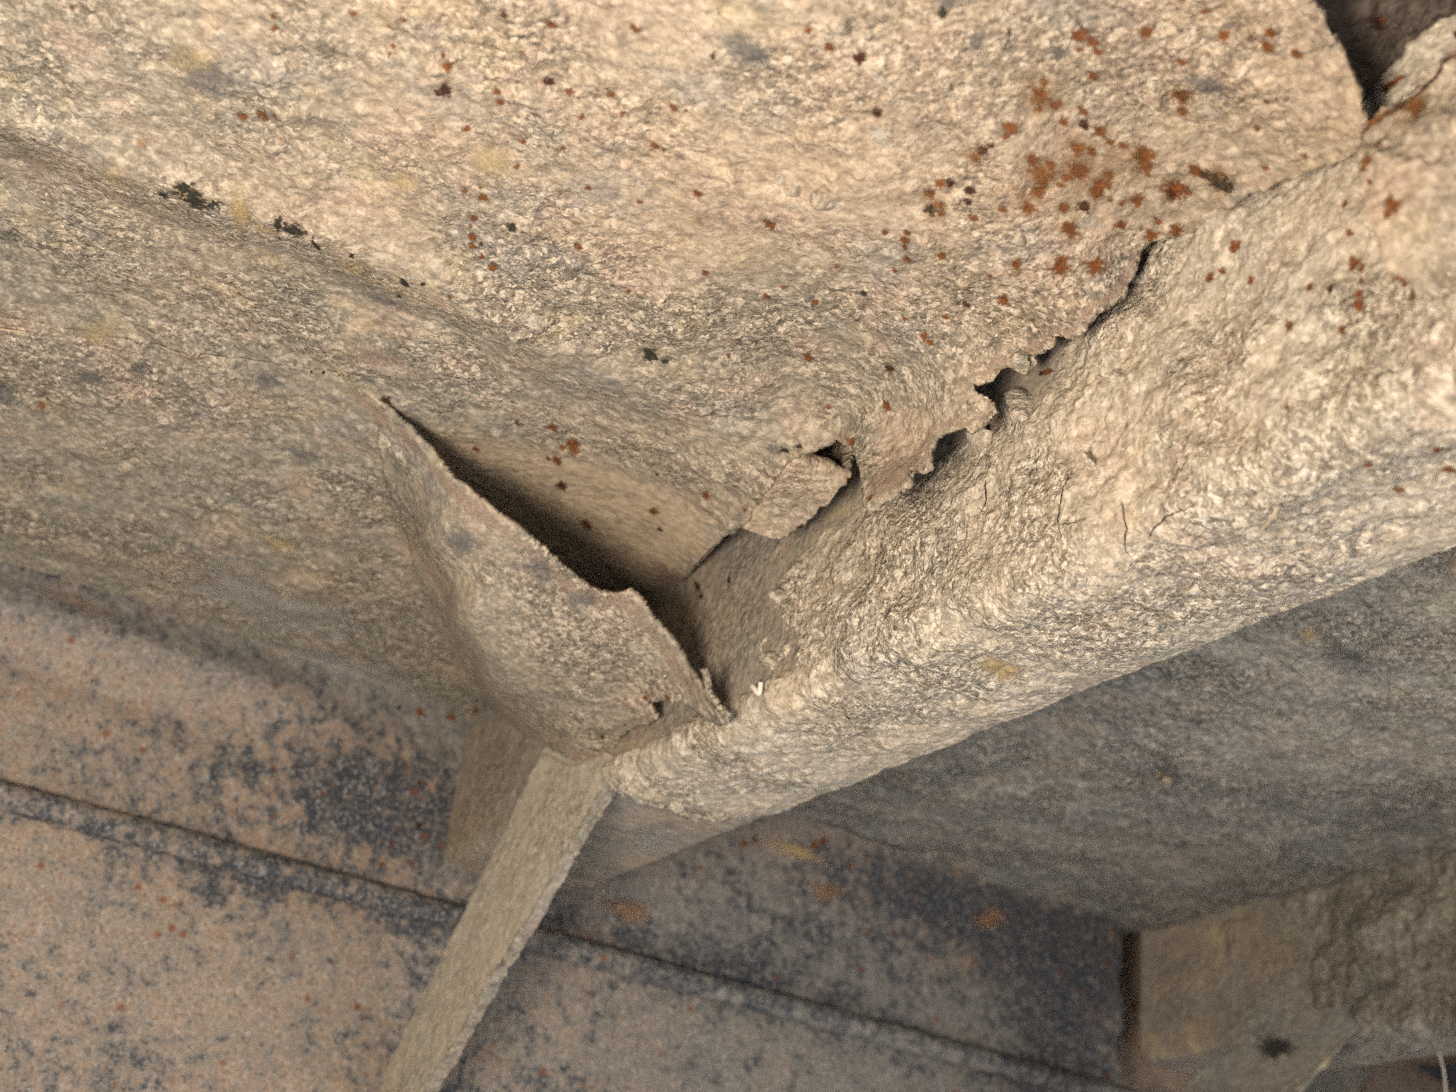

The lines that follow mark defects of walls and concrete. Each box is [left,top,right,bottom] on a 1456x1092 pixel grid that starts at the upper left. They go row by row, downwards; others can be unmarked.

rust [433,51,453,100]
rust [538,77,573,95]
rust [1066,28,1104,83]
rust [1249,28,1302,59]
rust [970,122,1019,162]
rust [998,77,1236,242]
rust [922,178,978,222]
rust [461,186,497,273]
rust [882,229,911,273]
rust [1047,255,1109,278]
rust [1205,240,1240,284]
rust [1345,229,1366,314]